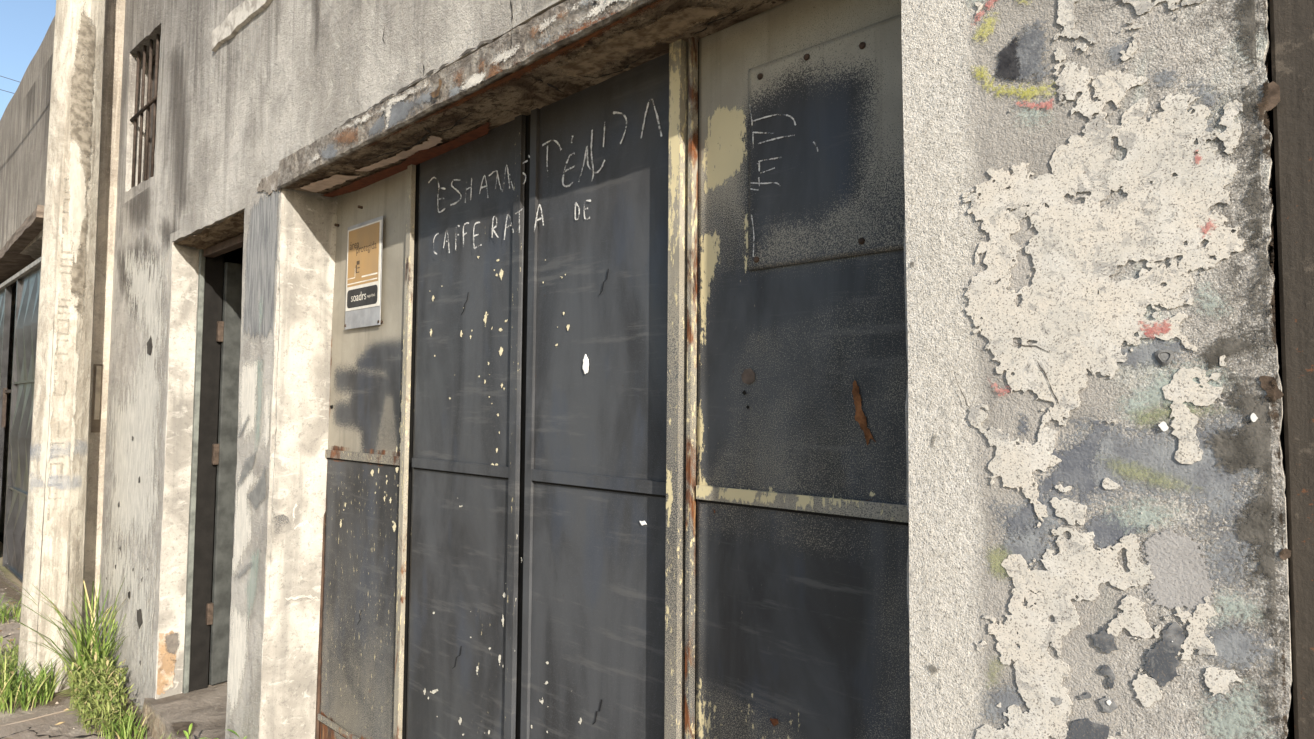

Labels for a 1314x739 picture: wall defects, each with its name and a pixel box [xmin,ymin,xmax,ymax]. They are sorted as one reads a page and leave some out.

peeling [536,0,632,32]
peeling [460,43,520,91]
spalling [558,6,728,78]
peeling [338,79,442,130]
spalling [1262,81,1280,111]
flaking render [257,168,282,195]
flaking render [300,136,442,192]
peeling [962,0,1245,739]
spalling [1259,376,1284,401]
crack [3,290,71,662]